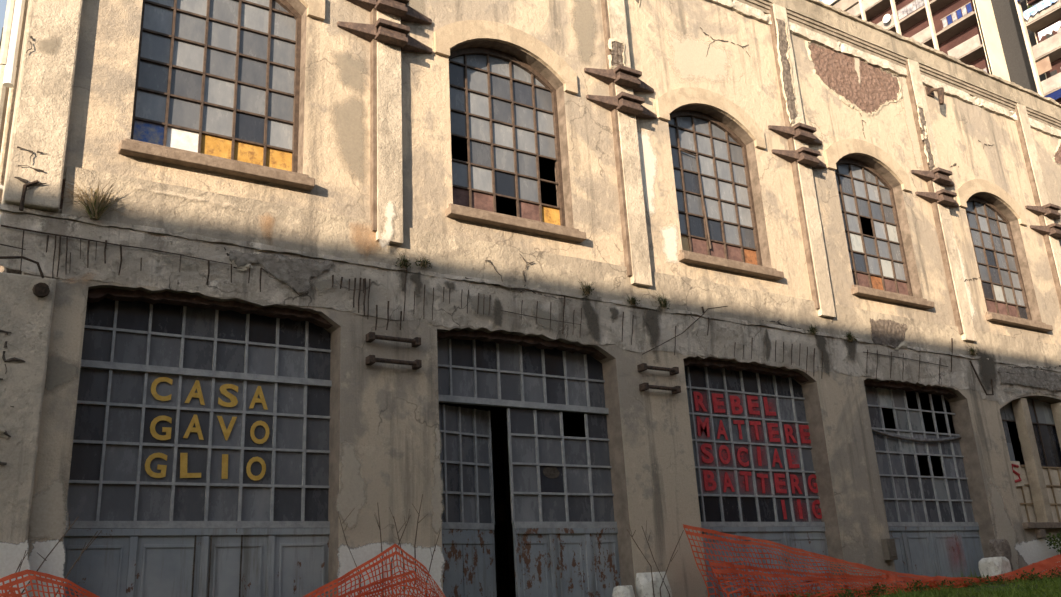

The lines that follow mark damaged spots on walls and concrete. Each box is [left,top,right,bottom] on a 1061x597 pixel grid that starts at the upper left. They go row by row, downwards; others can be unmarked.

spalling [775,18,797,124]
spalling [805,40,937,169]
spalling [0,225,232,285]
water stain [400,272,422,296]
spalling [332,269,582,334]
water stain [469,296,502,326]
spalling [0,330,25,380]